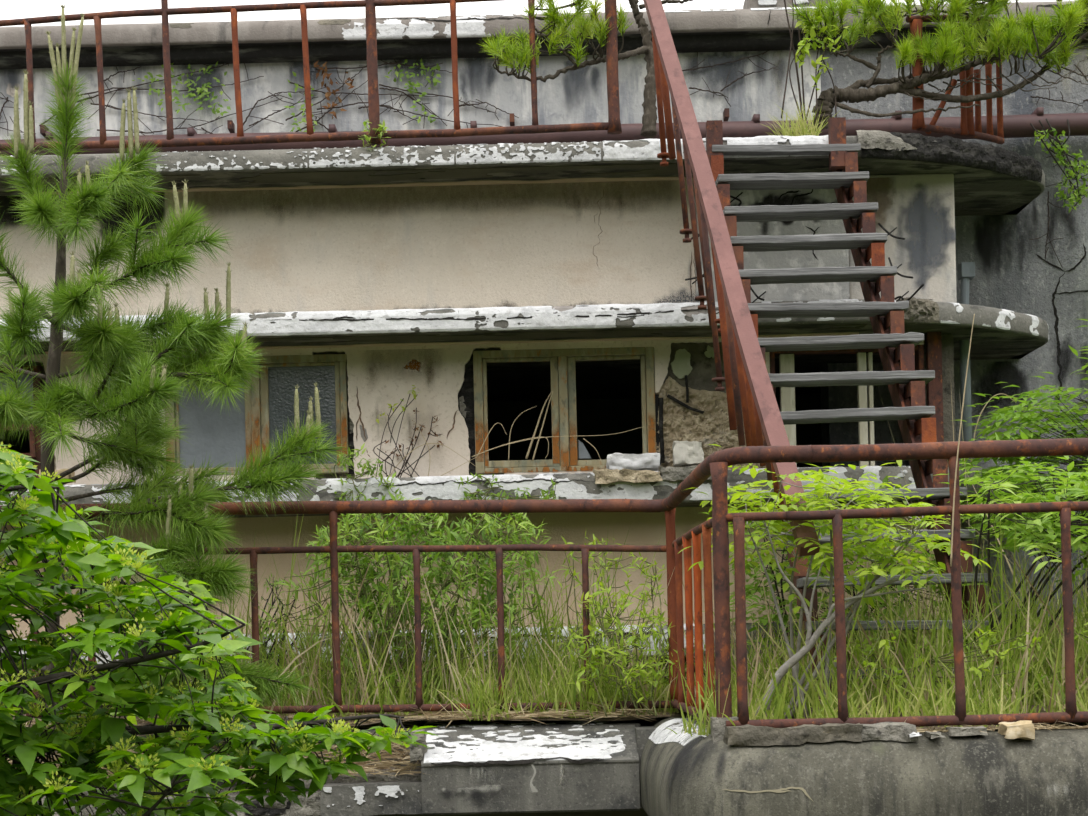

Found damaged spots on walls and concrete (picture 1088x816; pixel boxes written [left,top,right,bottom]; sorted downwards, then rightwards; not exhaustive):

water stain [462,58,495,94]
water stain [691,53,761,87]
peeling [723,135,829,158]
peeling [817,317,867,330]
spalling [895,297,963,324]
peeling [982,309,1049,341]
crack [1034,244,1088,418]
peeling [190,302,746,502]
spalling [727,463,774,499]
peeling [797,466,916,490]
peeling [424,721,626,764]